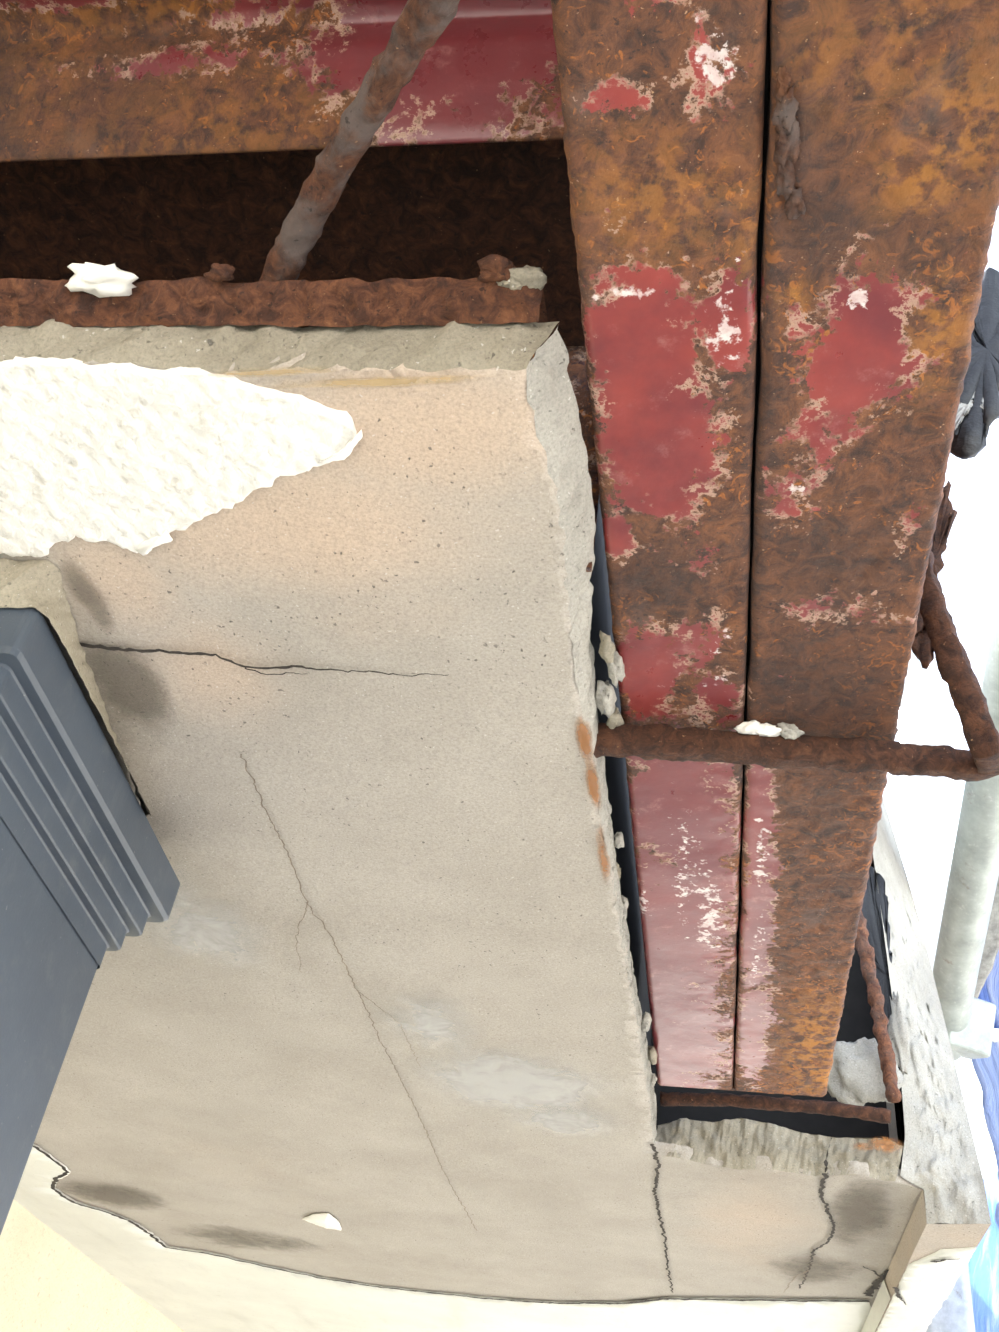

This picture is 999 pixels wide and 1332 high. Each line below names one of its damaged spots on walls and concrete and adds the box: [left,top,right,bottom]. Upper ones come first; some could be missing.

corrosion [931,480,958,578]
crack [80,642,447,676]
corrosion [911,612,934,669]
peeling [0,319,903,1181]
corrosion [577,722,600,804]
corrosion [599,834,609,876]
crack [240,754,477,1230]
damp [76,1187,150,1205]
peeling [14,1144,976,1332]
crack [650,1144,673,1292]
crack [785,1138,835,1290]